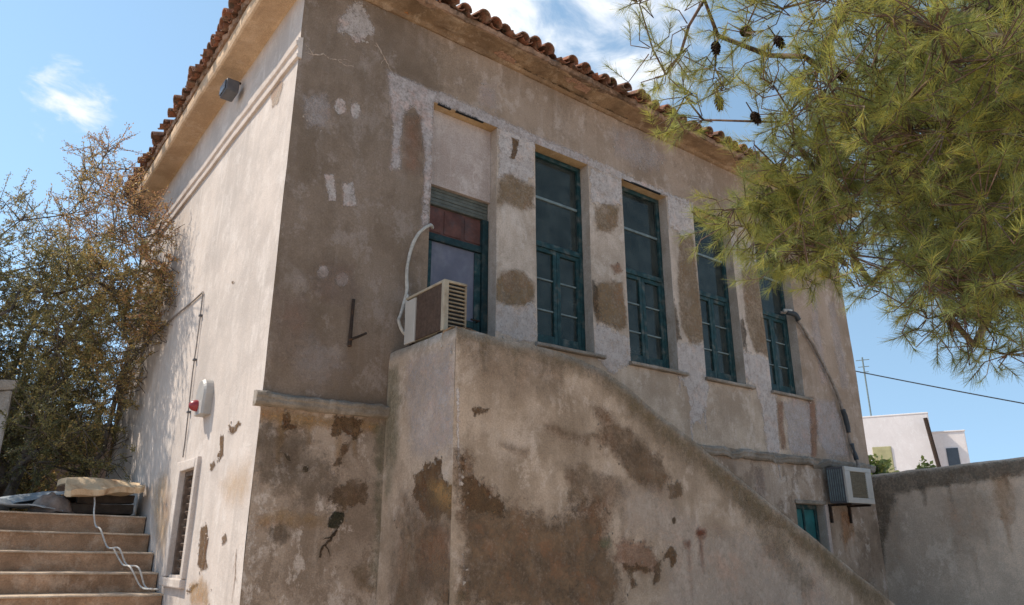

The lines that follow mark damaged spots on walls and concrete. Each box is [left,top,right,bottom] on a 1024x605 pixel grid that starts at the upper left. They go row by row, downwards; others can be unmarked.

spalling [209,421,241,471]
spalling [331,415,364,442]
spalling [411,389,506,521]
water stain [594,407,670,490]
water stain [609,379,884,605]
spalling [186,522,208,594]
crack [319,529,338,558]
spalling [615,539,678,596]